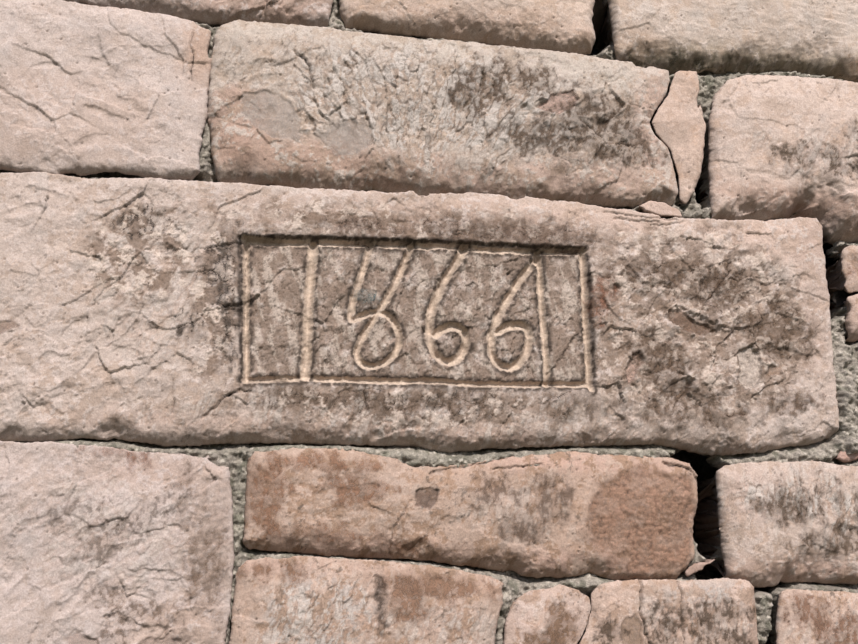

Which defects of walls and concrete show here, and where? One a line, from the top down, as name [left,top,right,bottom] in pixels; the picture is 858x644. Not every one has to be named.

crack [650,89,680,226]
crack [833,290,858,306]